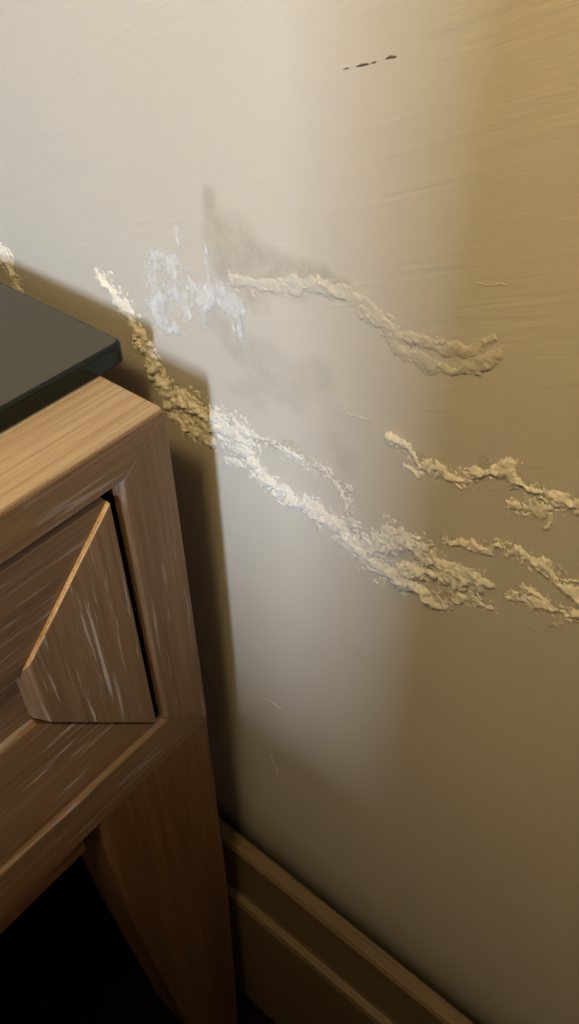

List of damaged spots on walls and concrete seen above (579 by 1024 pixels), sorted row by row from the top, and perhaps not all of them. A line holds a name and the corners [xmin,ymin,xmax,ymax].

water stain [94,267,579,633]